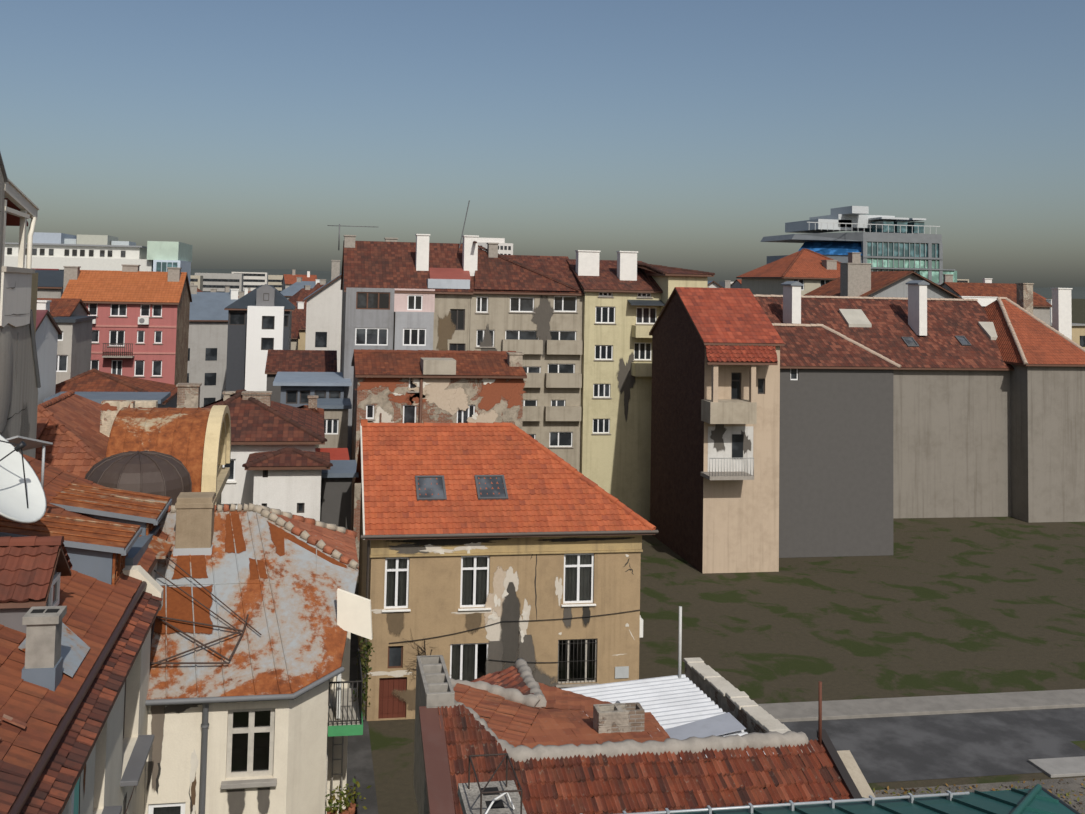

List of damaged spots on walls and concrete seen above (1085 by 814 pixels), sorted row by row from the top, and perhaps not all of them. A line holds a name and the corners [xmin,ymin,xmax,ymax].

flaking render [355,372,526,423]
corrosion [225,514,267,580]
corrosion [267,521,347,568]
corrosion [151,555,213,634]
flaking render [451,566,531,643]
flaking render [555,577,563,606]